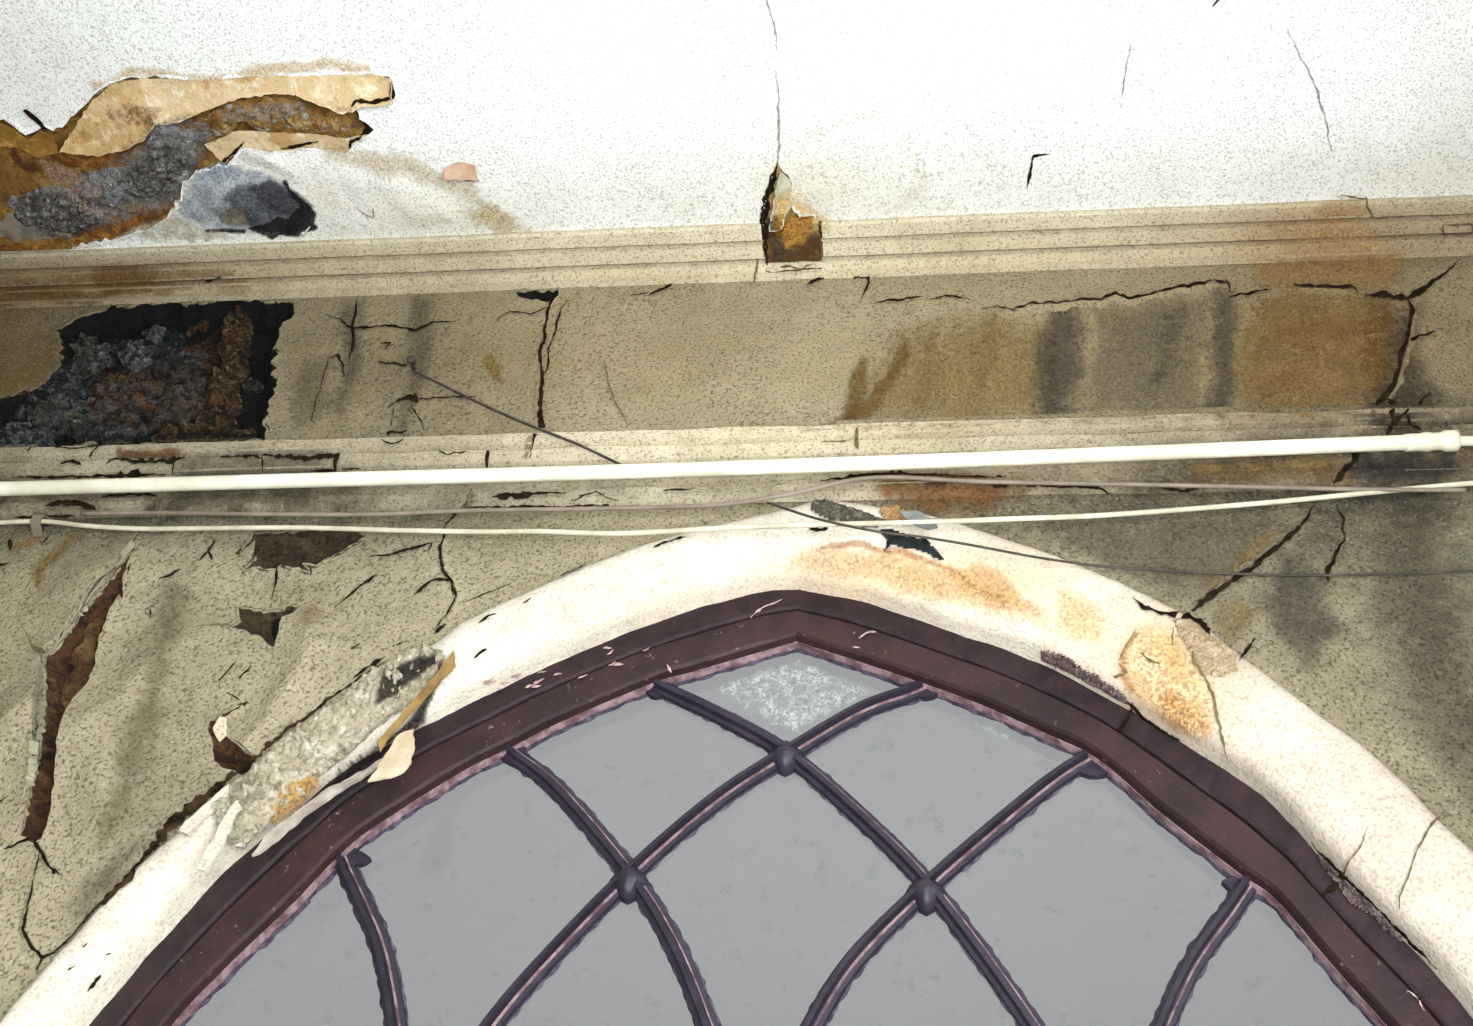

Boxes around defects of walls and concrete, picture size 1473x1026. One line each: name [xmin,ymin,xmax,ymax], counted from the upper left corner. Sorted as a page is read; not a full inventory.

peeling [0,70,398,252]
flaking render [0,299,299,447]
corrosion [832,321,1047,424]
leakage [1097,295,1232,415]
crack [13,444,185,519]
crack [220,299,618,636]
crack [753,223,1473,764]
corrosion [811,541,1040,616]
flaking render [15,531,147,846]
flaking render [179,623,456,872]
corrosion [1122,632,1211,737]
crack [1311,811,1444,970]